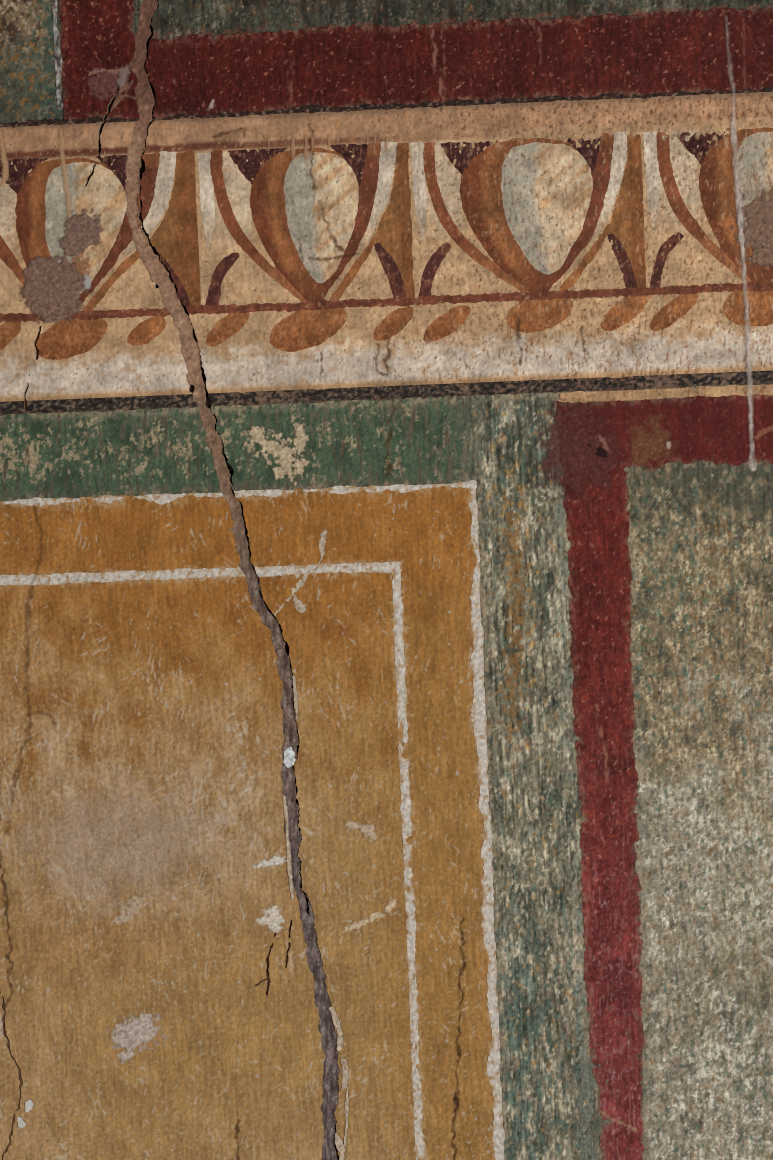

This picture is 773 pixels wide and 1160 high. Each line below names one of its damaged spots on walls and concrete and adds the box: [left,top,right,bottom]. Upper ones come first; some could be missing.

peeling [243,418,309,485]
crack [88,0,355,1160]
spalling [255,906,284,933]
crack [0,854,34,1160]
spalling [108,1013,167,1063]
crack [452,1093,460,1139]